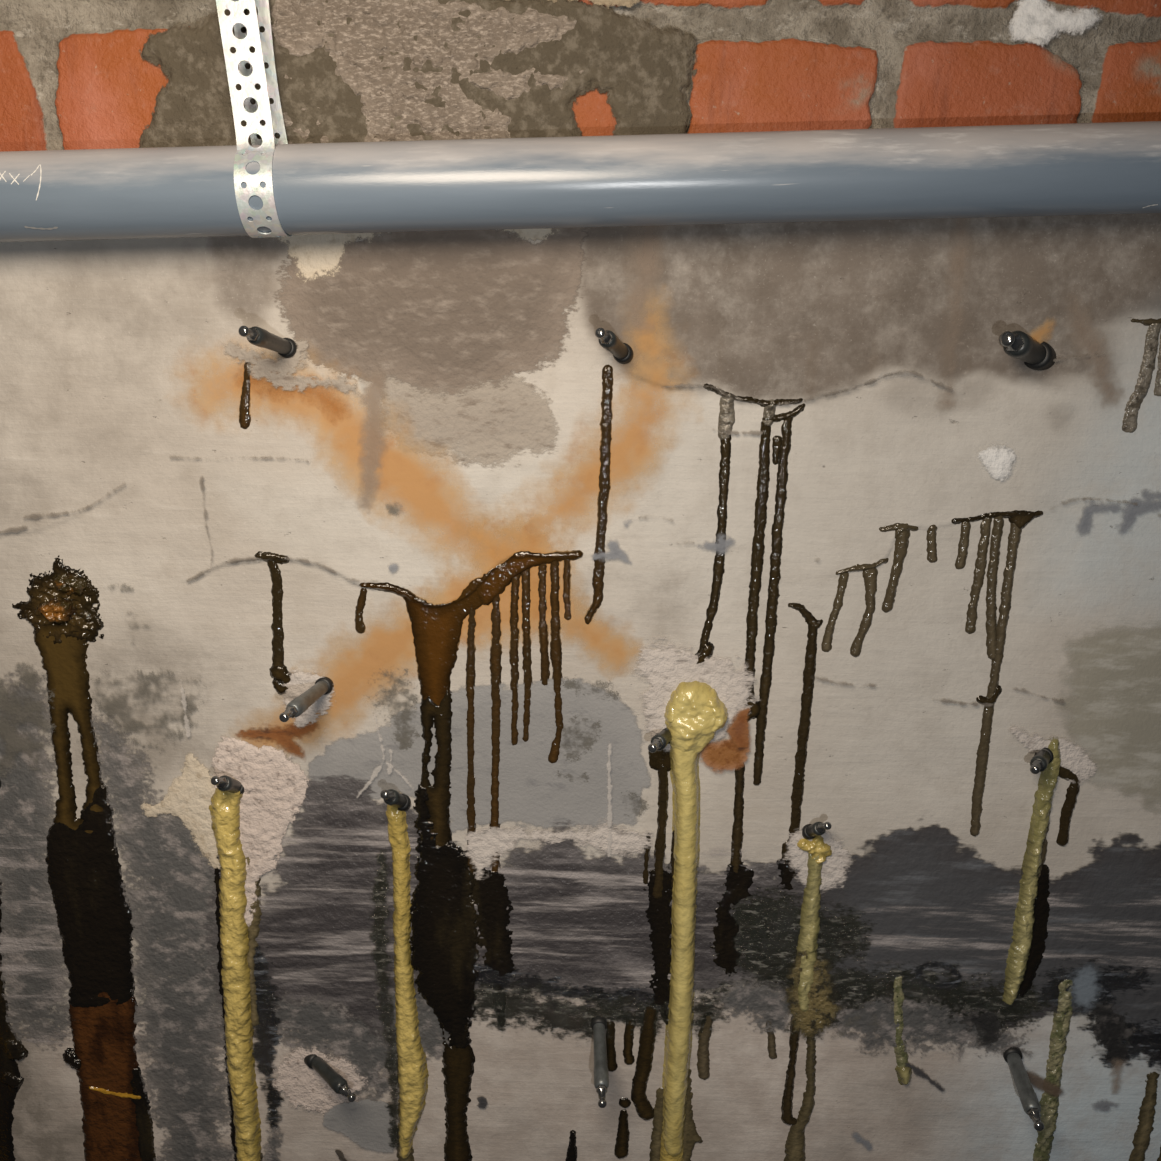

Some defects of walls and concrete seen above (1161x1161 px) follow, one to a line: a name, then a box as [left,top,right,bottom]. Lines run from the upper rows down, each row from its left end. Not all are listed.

efflorescence [1009,0,1102,47]
crack [0,505,92,534]
corrosion [194,304,671,669]
leakage [12,555,156,1161]
spalling [141,736,309,927]
corrosion [238,616,416,757]
leakage [308,365,675,1161]
corrosion [700,708,750,772]
leakage [691,383,938,1080]
leakage [951,510,1043,836]
leakage [0,879,29,1161]
leakage [766,900,1161,1161]